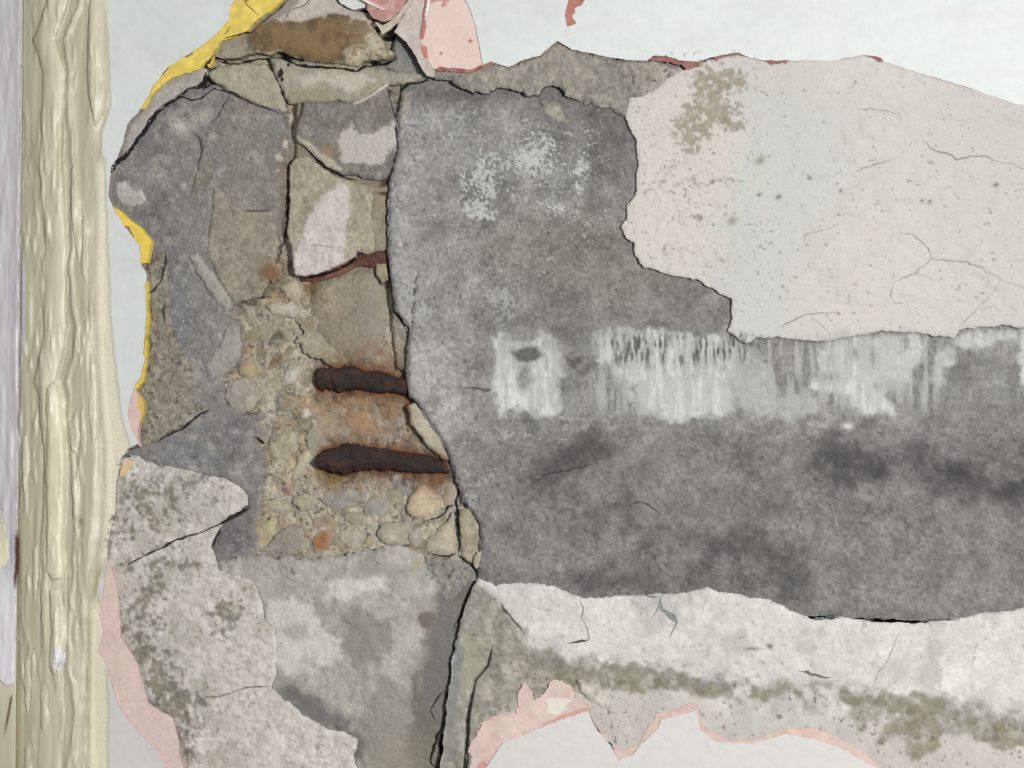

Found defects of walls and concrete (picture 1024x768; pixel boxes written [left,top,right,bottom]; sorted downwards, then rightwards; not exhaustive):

crack [110,0,429,376]
efflorescence [401,104,603,237]
peeling [0,0,27,685]
spalling [98,0,482,768]
rust [316,363,448,488]
flaking render [219,0,1024,768]
water stain [596,328,746,423]
water stain [810,332,923,415]
crack [127,507,250,566]
peeling [53,645,66,671]
crack [422,473,493,768]
mould [842,689,1024,759]